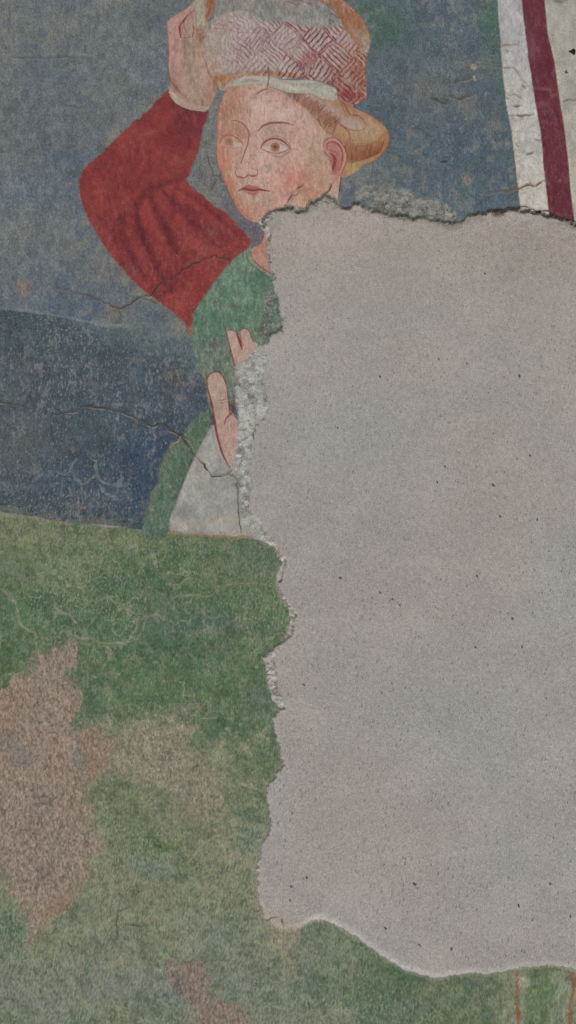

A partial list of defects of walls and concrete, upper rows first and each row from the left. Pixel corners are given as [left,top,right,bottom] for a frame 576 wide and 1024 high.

spalling [256,181,464,255]
crack [54,251,233,323]
crack [11,453,131,508]
crack [52,404,243,535]
spalling [229,283,296,710]